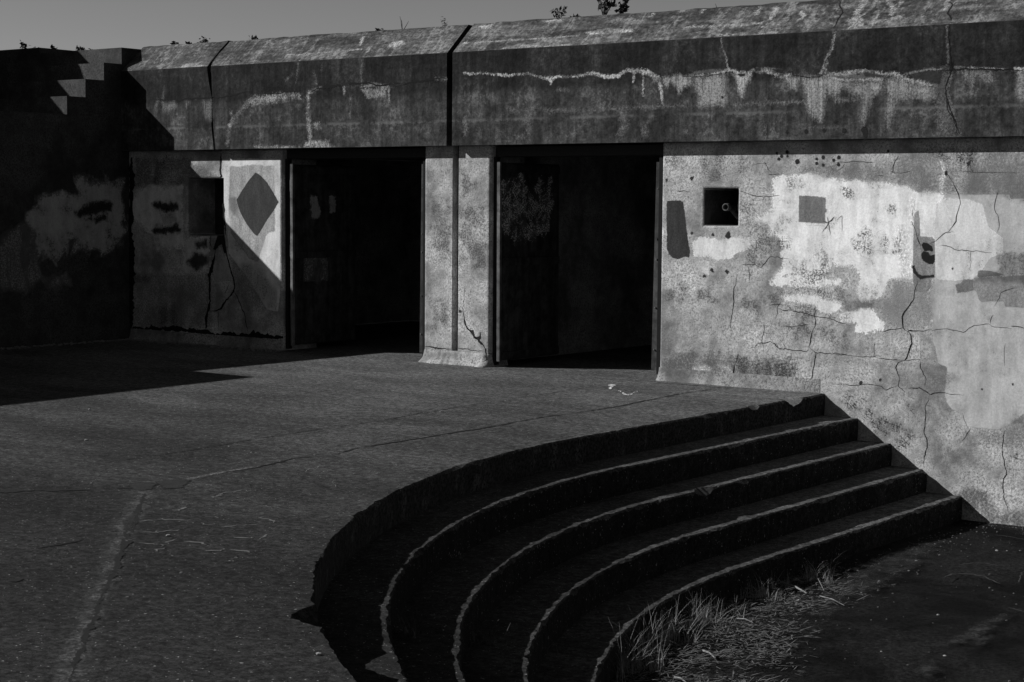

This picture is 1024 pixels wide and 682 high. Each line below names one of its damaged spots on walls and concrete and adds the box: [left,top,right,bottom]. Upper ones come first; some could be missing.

water stain [534,69,754,117]
crack [819,1,843,74]
water stain [778,75,934,118]
crack [935,1,1024,137]
peeling [26,177,126,260]
crack [204,204,248,331]
peeling [754,150,947,335]
crack [911,171,1011,269]
crack [68,256,1023,682]